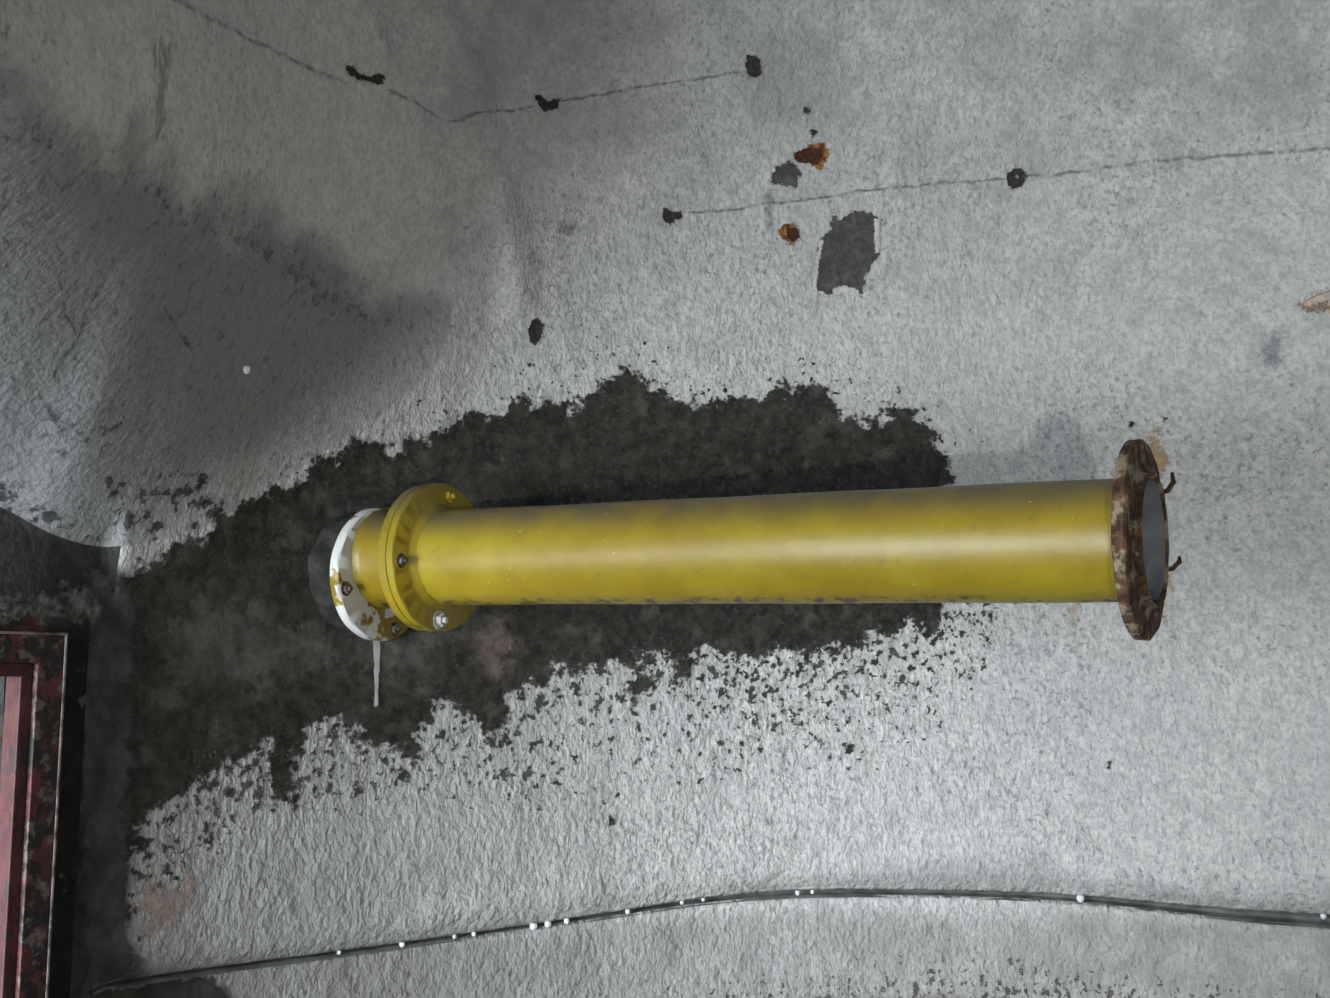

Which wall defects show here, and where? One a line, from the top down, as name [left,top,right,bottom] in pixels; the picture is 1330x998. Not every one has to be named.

rust [793,142,830,170]
crack [1162,152,1273,162]
rust [778,223,800,245]
peeling [812,210,881,297]
peeling [1296,290,1330,314]
rust [1150,430,1168,472]
damp [0,336,998,998]
damp [874,952,1240,998]